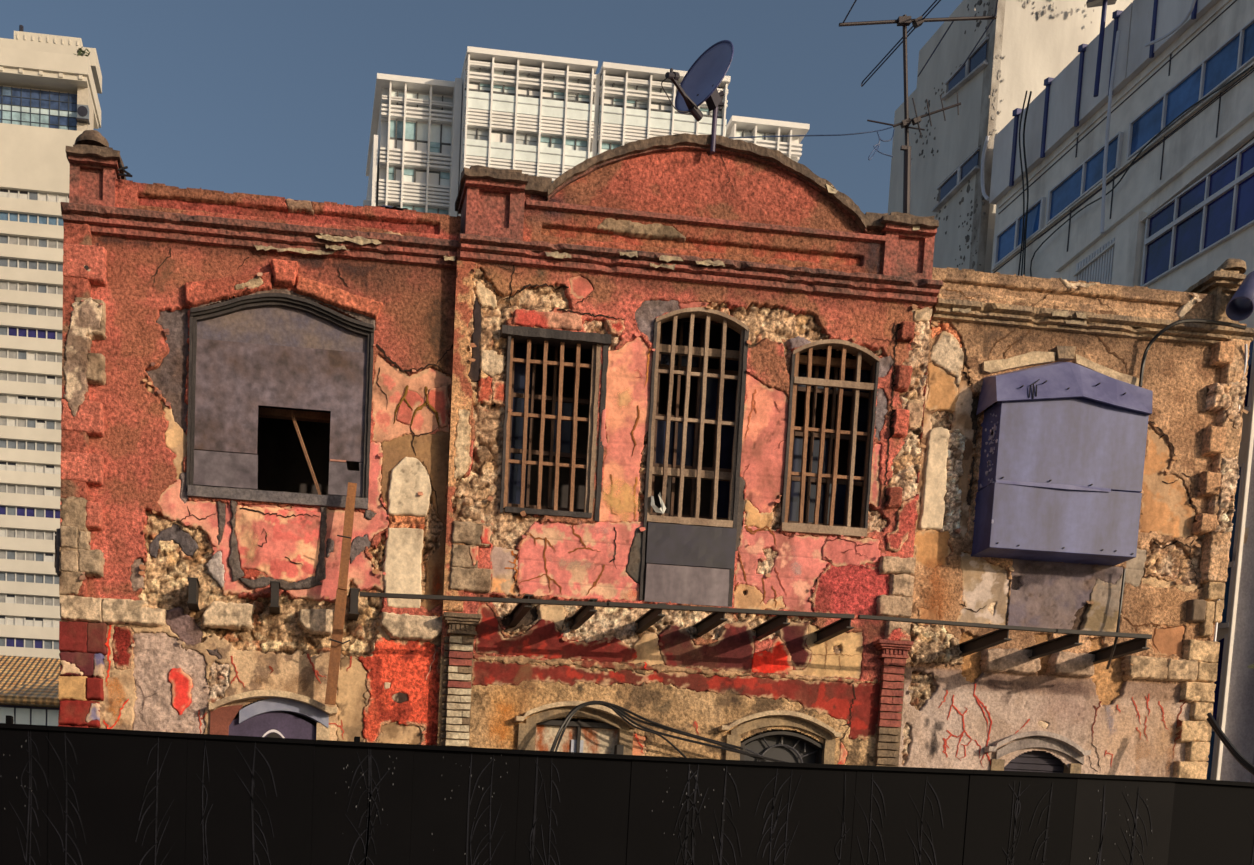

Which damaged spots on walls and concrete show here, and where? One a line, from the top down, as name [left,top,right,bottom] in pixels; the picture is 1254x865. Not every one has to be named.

spalling [545,251,571,259]
crack [495,263,625,320]
spalling [1052,310,1088,326]
spalling [1059,278,1098,290]
spalling [1176,293,1202,320]
peeling [59,268,1022,765]
crack [505,348,651,596]
crack [1149,420,1199,583]
peeling [1140,424,1249,593]
peeling [1072,573,1134,705]
crack [938,684,1030,768]
crack [1088,694,1187,772]